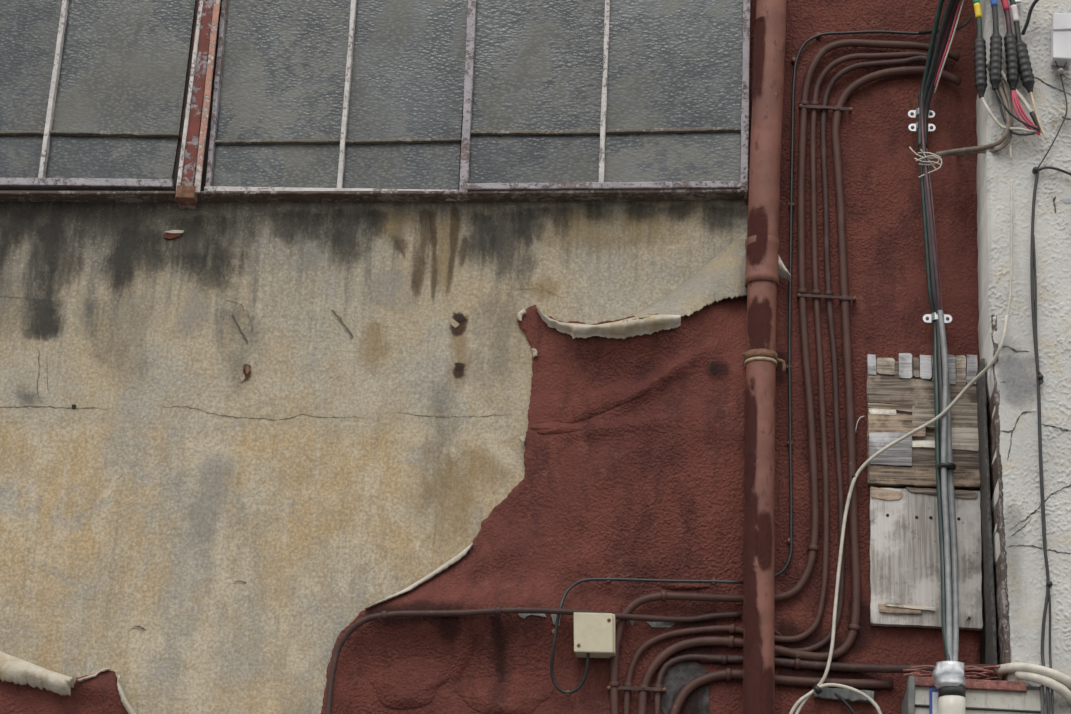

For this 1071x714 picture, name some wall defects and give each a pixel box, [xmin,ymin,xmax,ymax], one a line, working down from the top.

damp [0,202,235,337]
damp [277,210,384,256]
damp [395,208,535,297]
peeling [778,256,791,281]
rust [450,312,468,336]
rust [453,363,465,378]
peeling [321,231,747,714]
crack [999,411,1071,654]
peeling [0,650,137,714]